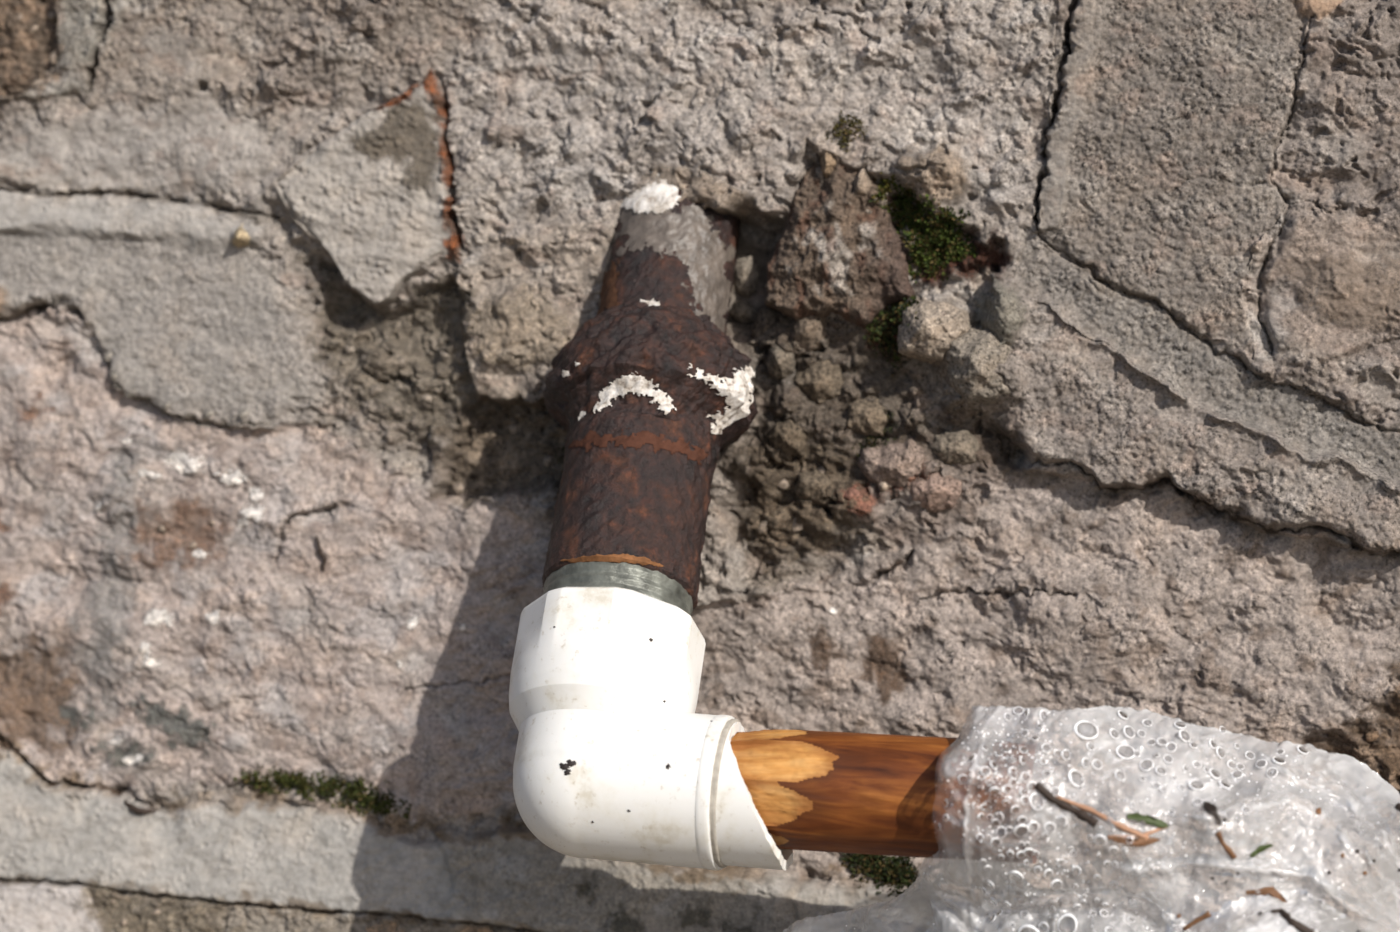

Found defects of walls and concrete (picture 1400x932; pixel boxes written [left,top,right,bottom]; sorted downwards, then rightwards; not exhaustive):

crack [87,62,99,93]
crack [1036,20,1071,235]
spalling [745,437,869,573]
crack [1072,462,1396,553]